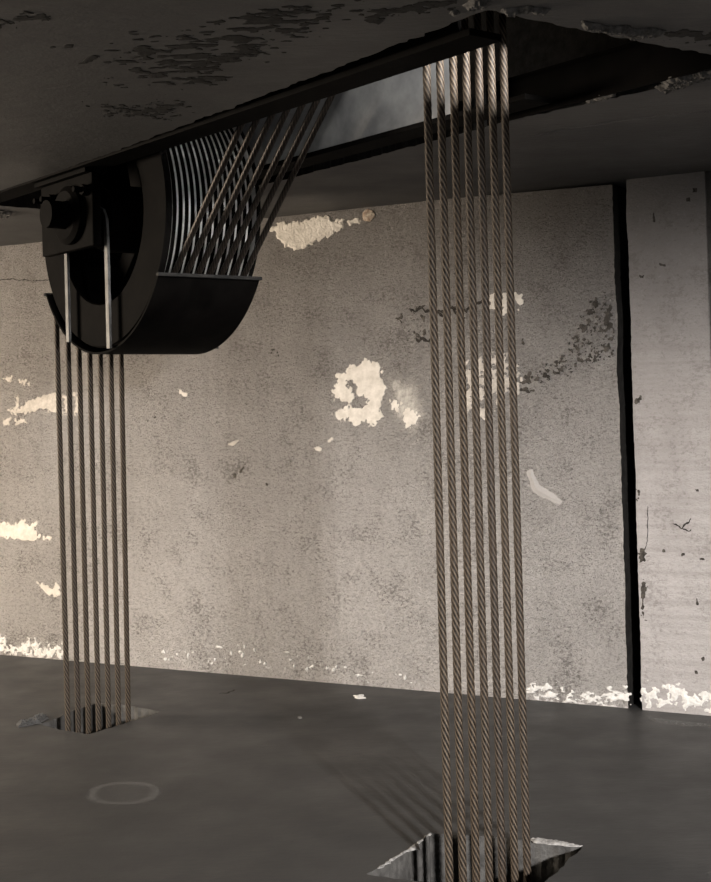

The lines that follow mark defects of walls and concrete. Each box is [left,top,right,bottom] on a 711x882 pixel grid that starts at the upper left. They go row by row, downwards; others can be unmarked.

peeling [269,215,361,251]
spalling [465,292,615,420]
peeling [3,374,78,426]
peeling [332,358,421,428]
peeling [0,518,52,541]